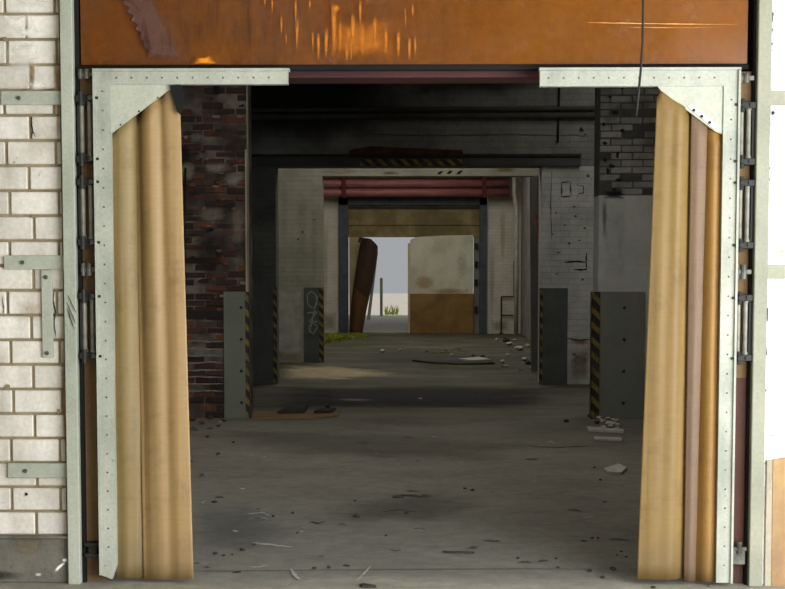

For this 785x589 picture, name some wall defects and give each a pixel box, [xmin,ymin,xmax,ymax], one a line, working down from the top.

corrosion [312,0,368,58]